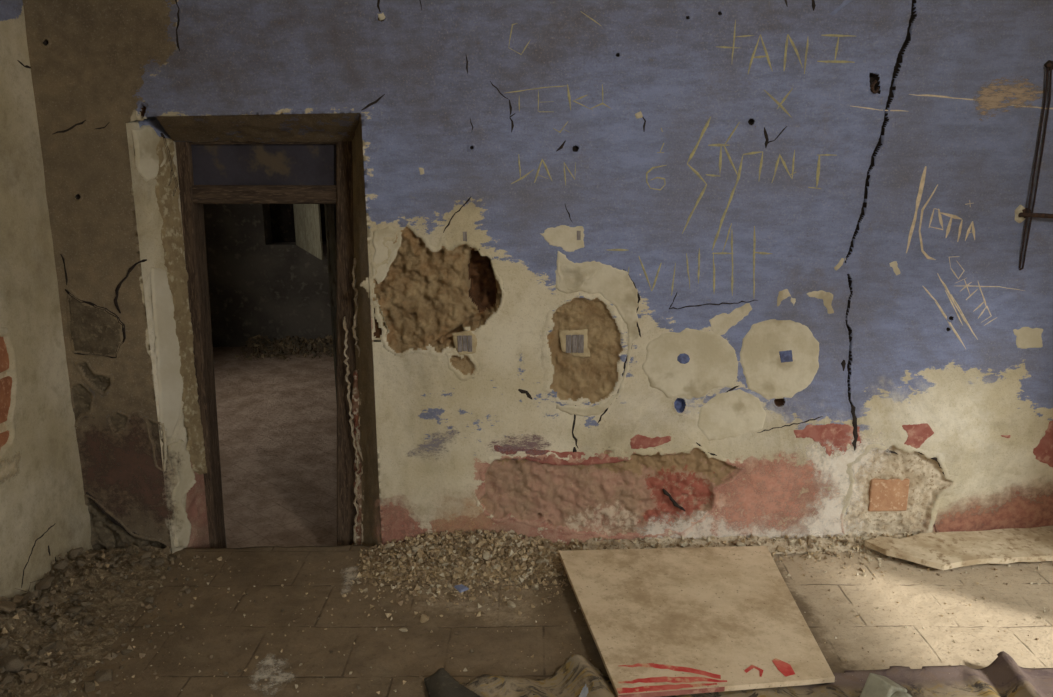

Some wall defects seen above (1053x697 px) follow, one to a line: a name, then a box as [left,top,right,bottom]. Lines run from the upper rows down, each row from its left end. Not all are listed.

crack [466,55,515,133]
crack [764,126,787,148]
crack [841,0,920,451]
spalling [0,327,20,482]
crack [60,254,147,358]
spalling [84,101,207,552]
spalling [343,221,508,545]
spalling [540,225,639,416]
spalling [474,434,754,540]
crack [757,416,823,433]
spalling [794,423,961,537]
crack [882,444,946,479]